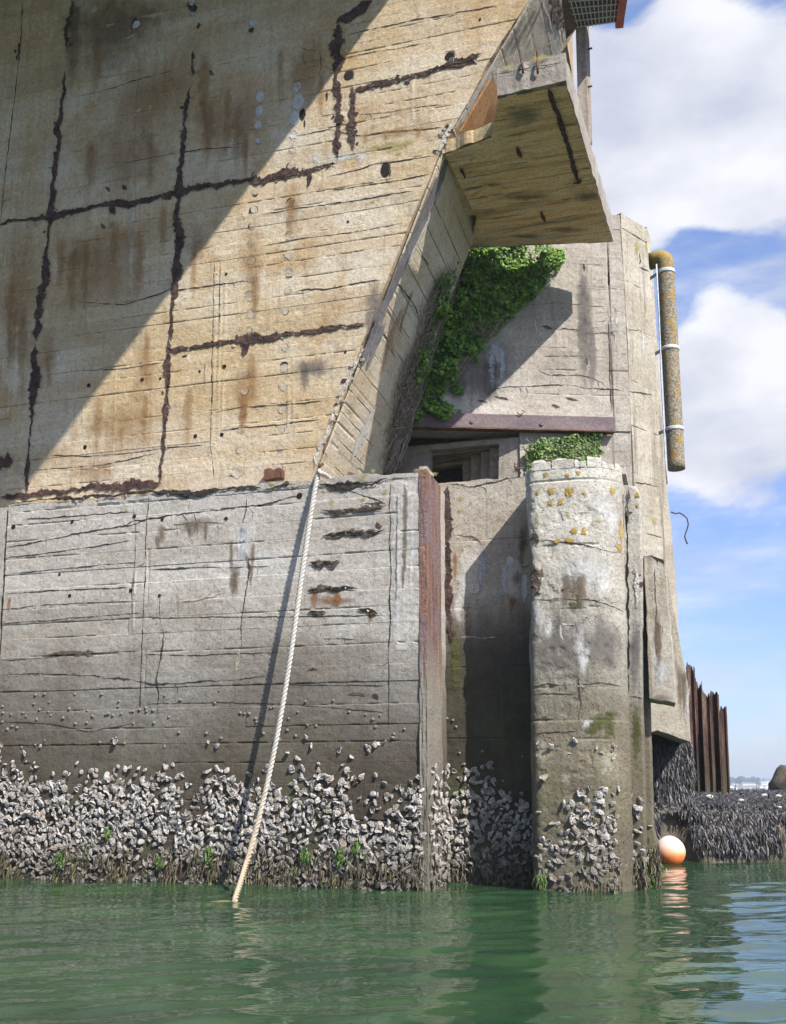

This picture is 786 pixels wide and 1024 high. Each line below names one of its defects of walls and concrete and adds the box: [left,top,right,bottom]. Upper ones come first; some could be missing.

crack [302,5,495,76]
crack [0,5,23,220]
crack [124,142,257,164]
crack [289,104,442,167]
crack [2,156,428,732]
spalling [322,502,385,539]
spalling [310,558,340,570]
corrosion [312,592,342,607]
spalling [308,584,356,593]
leakage [564,557,610,609]